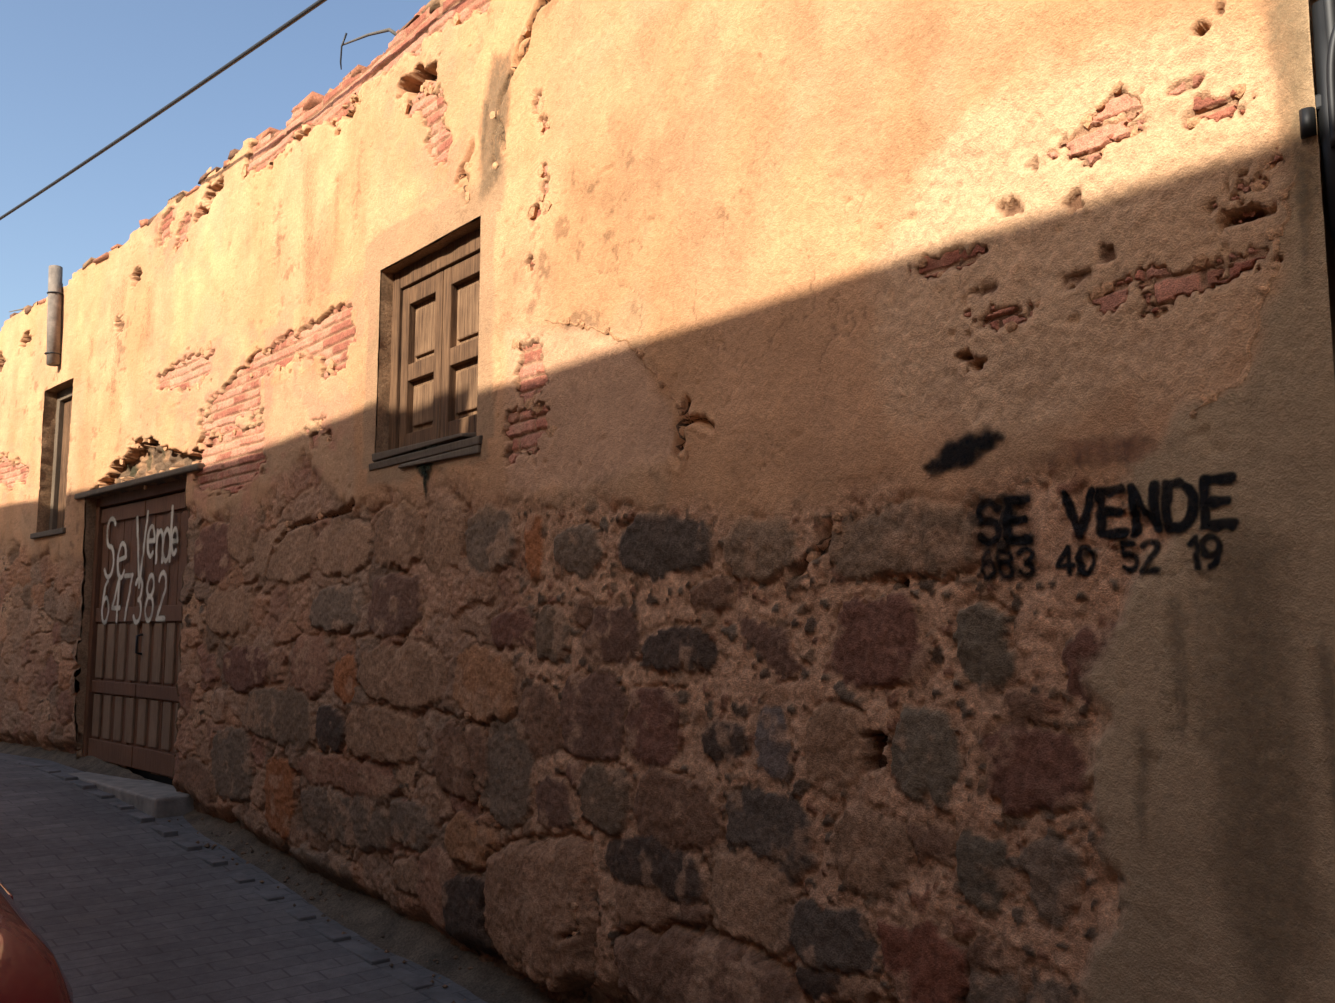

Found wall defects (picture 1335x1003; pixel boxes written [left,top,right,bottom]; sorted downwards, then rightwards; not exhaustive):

peeling [400,75,453,164]
peeling [1047,81,1145,167]
peeling [1168,75,1255,130]
peeling [1213,147,1284,223]
peeling [161,209,191,251]
peeling [909,245,985,278]
peeling [964,301,1041,333]
peeling [1090,248,1278,318]
peeling [546,317,676,401]
peeling [112,306,357,494]
peeling [506,338,557,464]
peeling [0,454,29,490]